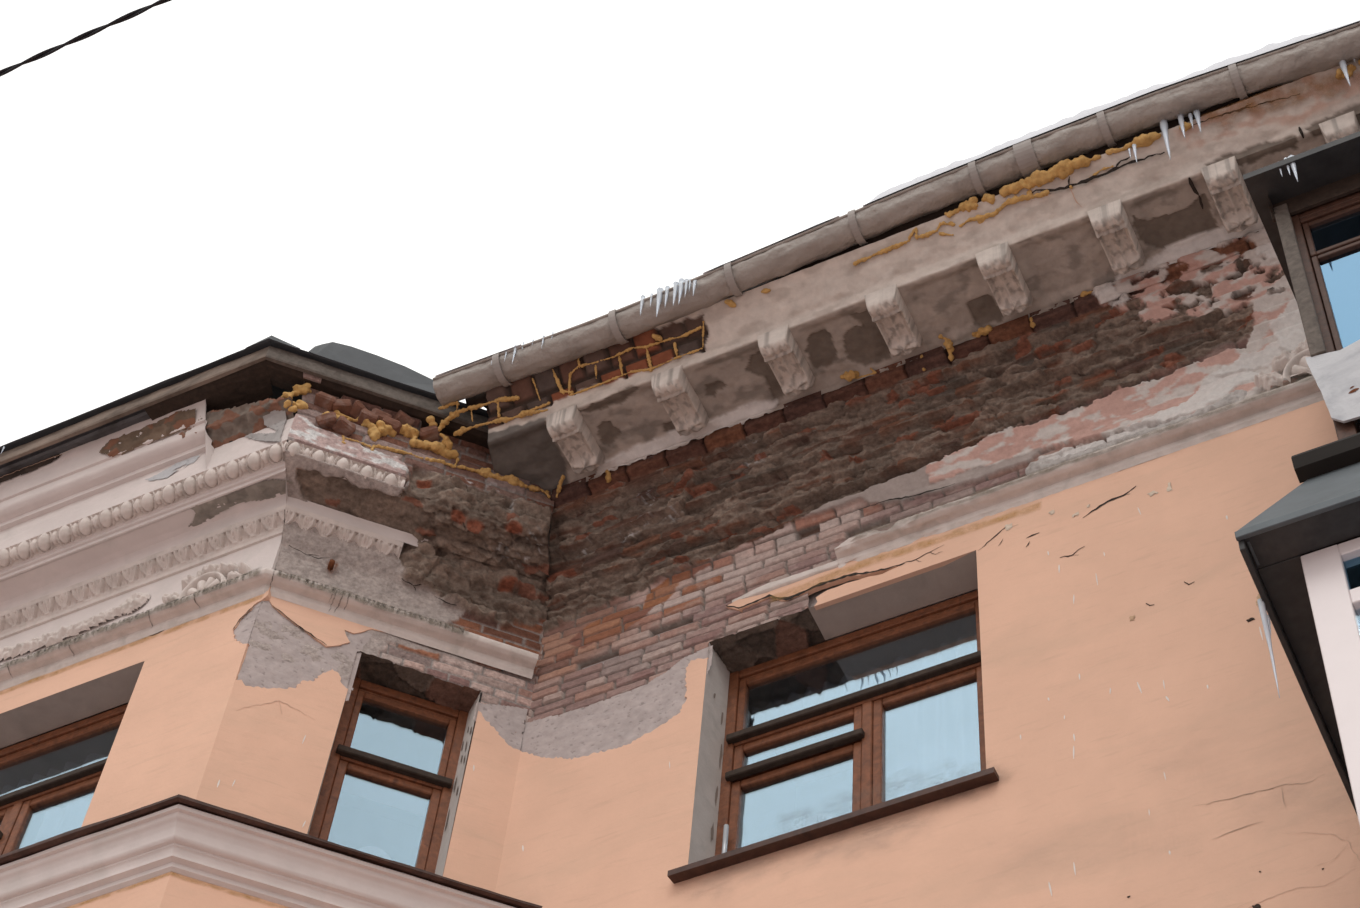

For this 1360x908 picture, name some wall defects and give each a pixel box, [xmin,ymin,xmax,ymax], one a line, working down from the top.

flaking render [99,228,1312,763]
crack [1060,486,1136,558]
crack [1196,774,1360,908]